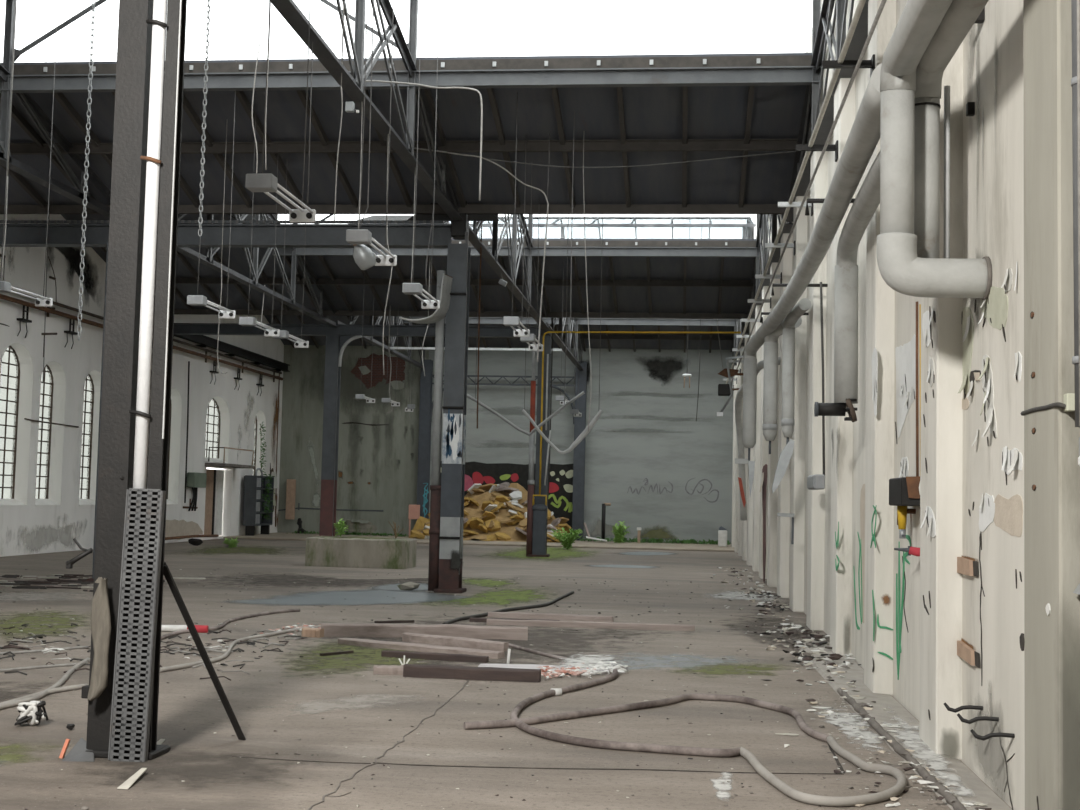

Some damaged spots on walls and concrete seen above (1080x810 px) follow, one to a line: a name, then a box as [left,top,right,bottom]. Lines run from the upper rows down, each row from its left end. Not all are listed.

flaking render [351,353,405,390]
peeling [1013,351,1035,382]
spalling [958,262,1023,550]
water stain [223,574,428,586]
crack [232,680,845,810]